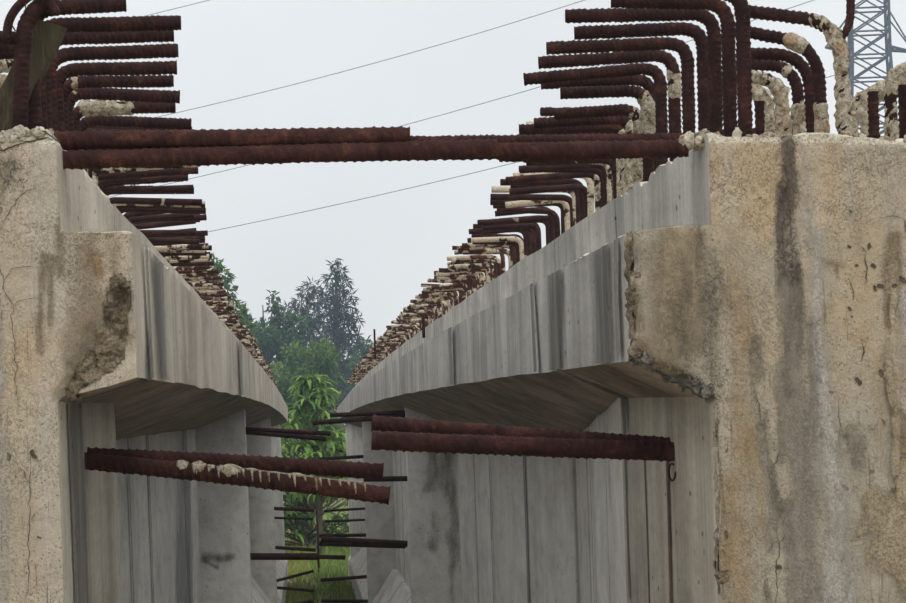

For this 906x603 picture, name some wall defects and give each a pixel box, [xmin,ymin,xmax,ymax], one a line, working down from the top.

spalling [0,124,61,143]
crack [0,266,36,399]
damp [37,218,63,355]
spalling [66,273,131,401]
spalling [624,230,714,404]
damp [774,136,858,603]
damp [883,232,906,338]
crack [17,449,35,603]